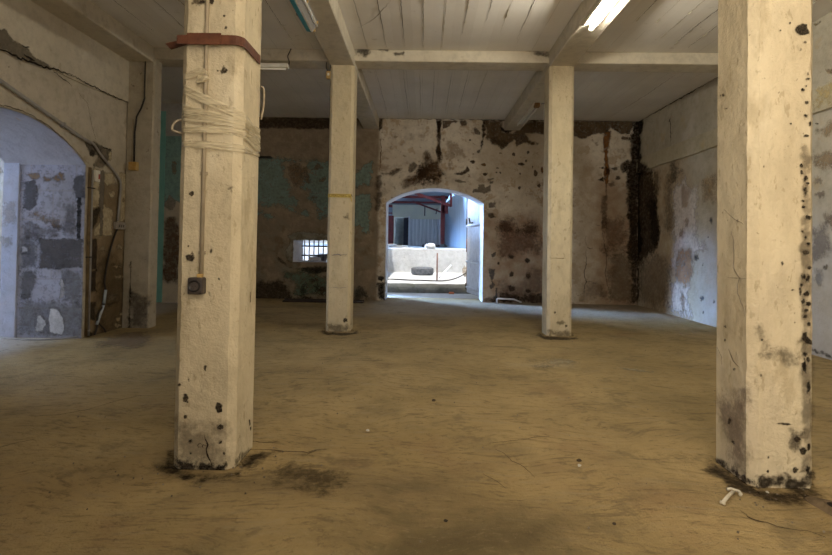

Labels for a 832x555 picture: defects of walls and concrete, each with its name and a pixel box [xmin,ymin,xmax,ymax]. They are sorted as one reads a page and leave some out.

crack [355,0,535,47]
spalling [0,29,49,67]
crack [0,45,126,139]
water stain [443,120,544,153]
peeling [257,156,329,220]
peeling [345,161,374,234]
water stain [382,152,445,186]
water stain [497,220,543,258]
water stain [574,119,714,318]